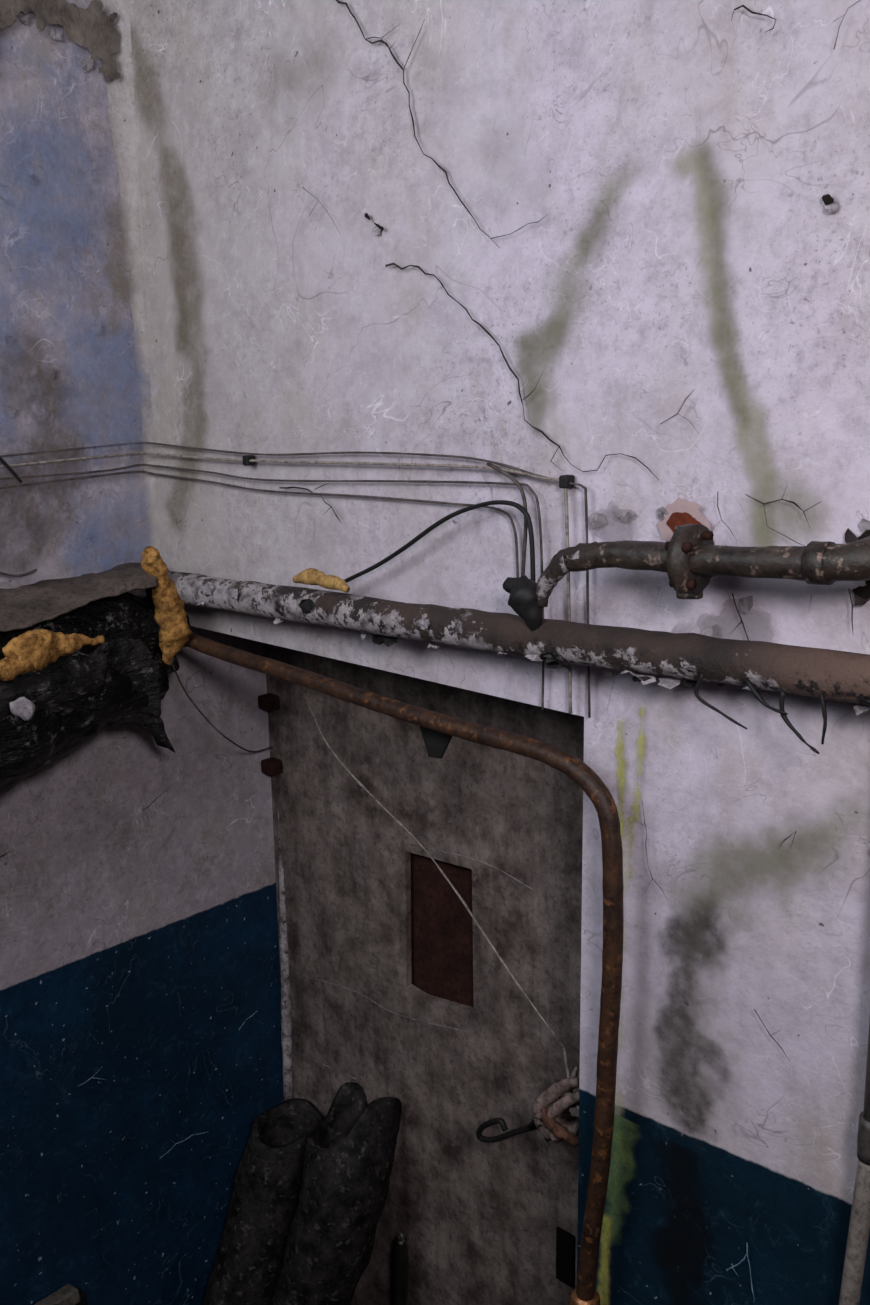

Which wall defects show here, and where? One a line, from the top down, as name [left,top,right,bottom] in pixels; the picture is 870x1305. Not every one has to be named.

peeling [0,0,121,83]
crack [336,0,544,248]
crack [731,5,776,33]
crack [385,263,659,480]